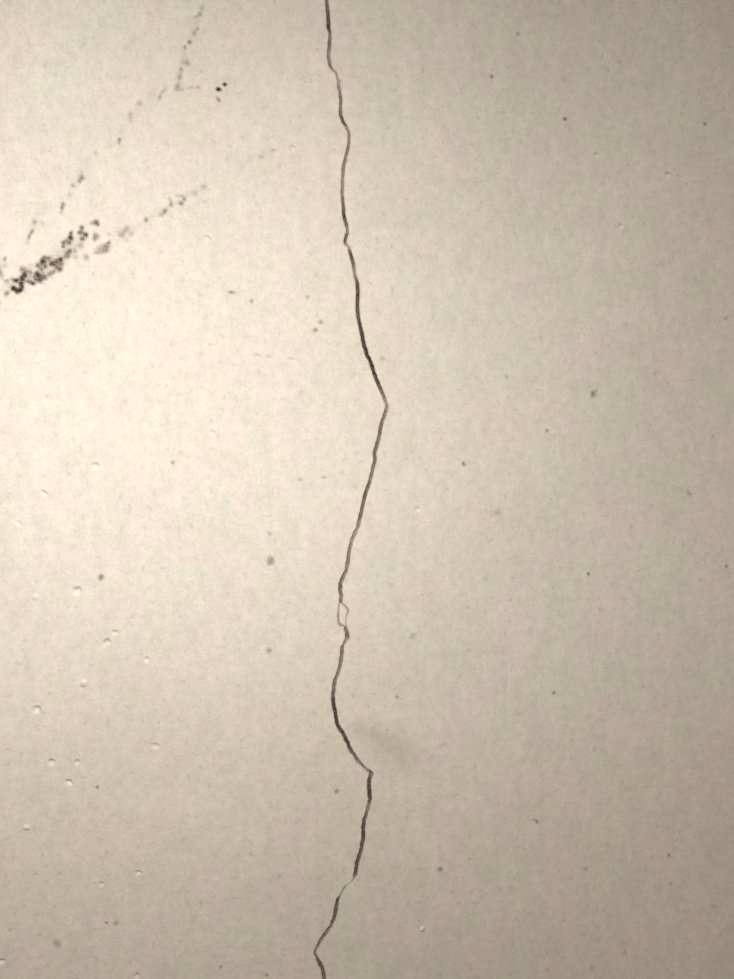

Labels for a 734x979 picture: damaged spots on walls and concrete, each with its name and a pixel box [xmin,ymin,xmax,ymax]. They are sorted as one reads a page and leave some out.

crack [314,0,388,979]